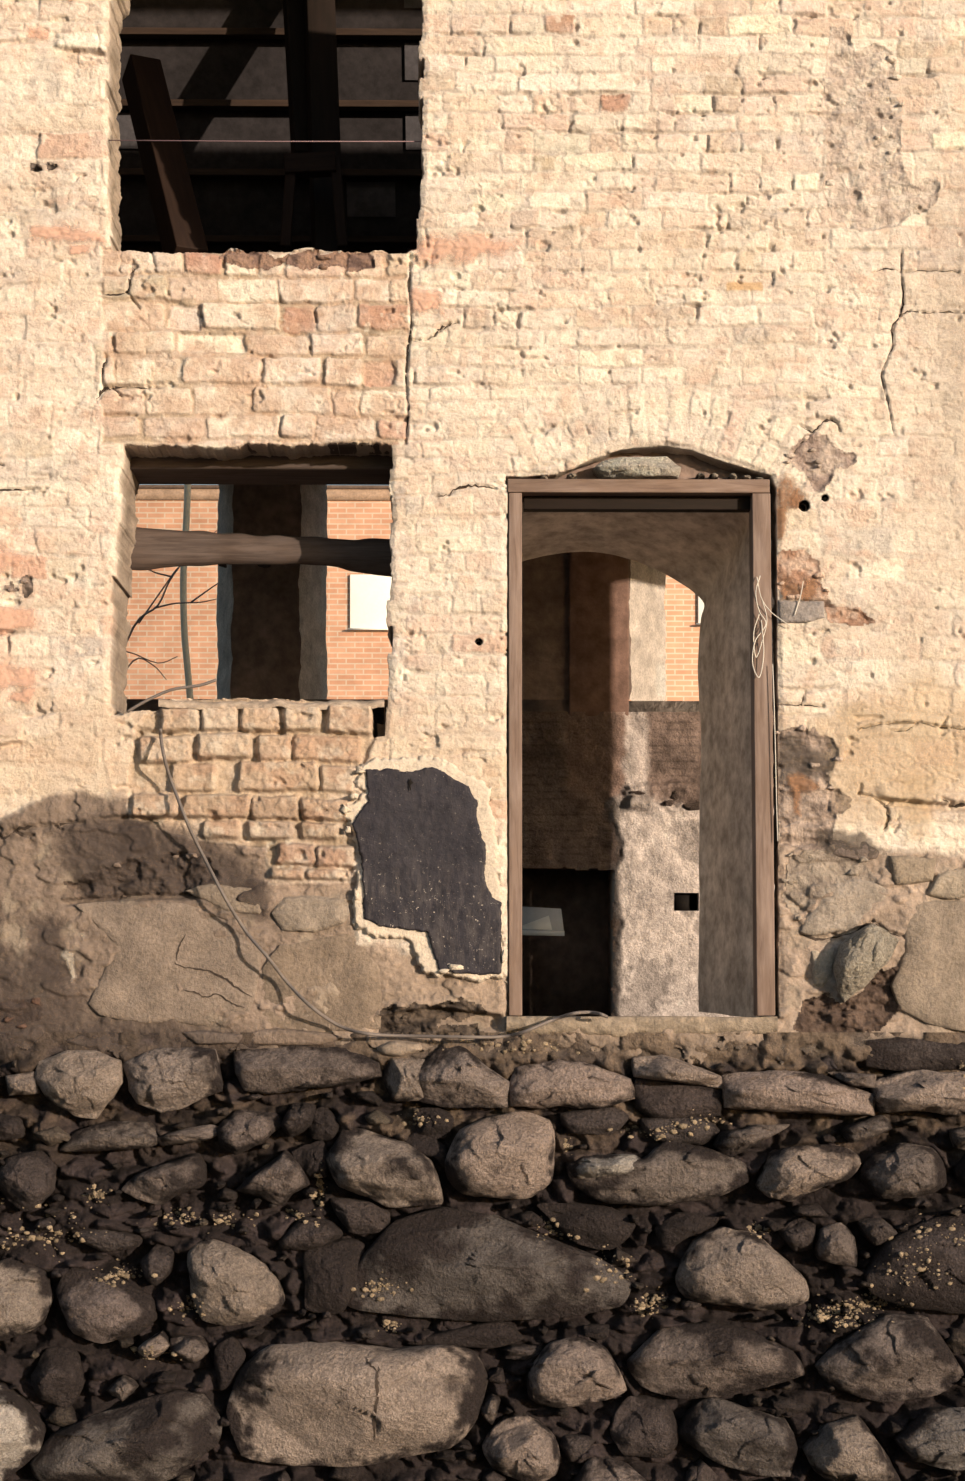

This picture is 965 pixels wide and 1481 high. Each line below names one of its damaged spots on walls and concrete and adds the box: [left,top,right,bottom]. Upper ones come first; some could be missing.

crack [878,254,958,429]
spalling [783,432,857,493]
spalling [776,549,875,626]
spalling [772,712,878,920]
flaking render [64,853,212,901]
damp [235,884,268,919]
flaking render [522,712,740,1017]
flaking render [794,966,901,1035]